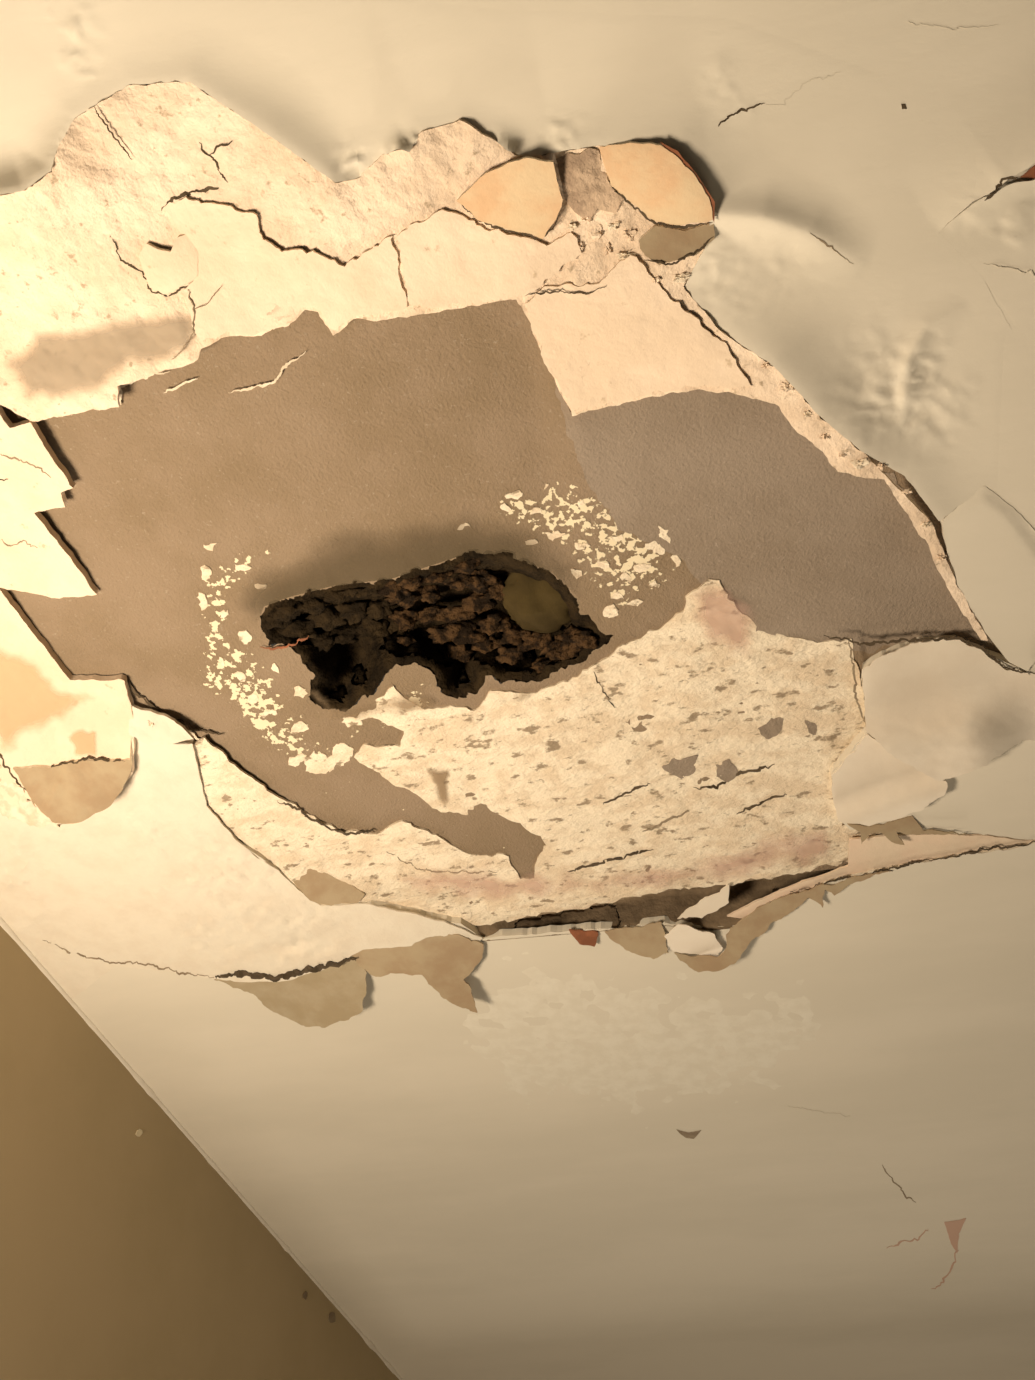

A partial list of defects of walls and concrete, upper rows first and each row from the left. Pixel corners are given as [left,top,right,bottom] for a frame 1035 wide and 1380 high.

crack [718,72,839,127]
crack [0,454,51,481]
flaking render [0,81,1035,1028]